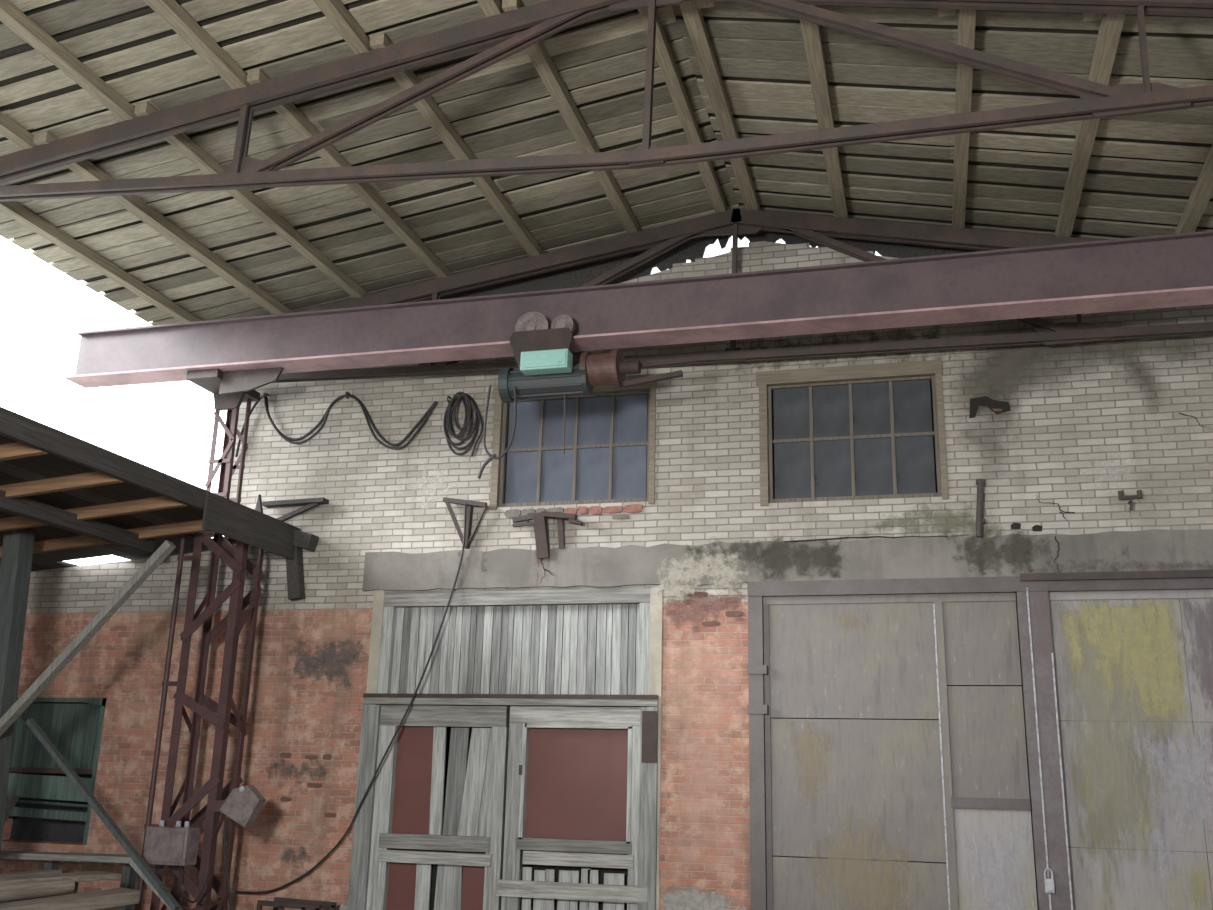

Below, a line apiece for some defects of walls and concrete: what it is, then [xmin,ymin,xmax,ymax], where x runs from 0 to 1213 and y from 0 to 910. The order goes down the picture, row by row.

leakage [966,329,1210,408]
spalling [504,504,643,524]
leakage [693,538,839,579]
leakage [878,512,1059,575]
leakage [294,642,362,685]
leakage [270,760,326,777]